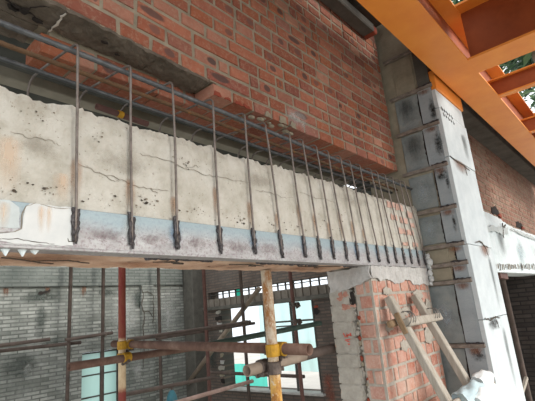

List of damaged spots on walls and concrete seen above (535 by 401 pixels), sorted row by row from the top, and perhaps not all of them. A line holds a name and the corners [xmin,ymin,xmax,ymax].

crack [78,163,168,193]
crack [140,153,335,203]
peeling [0,182,73,246]
crack [141,286,154,367]
spalling [337,291,370,401]